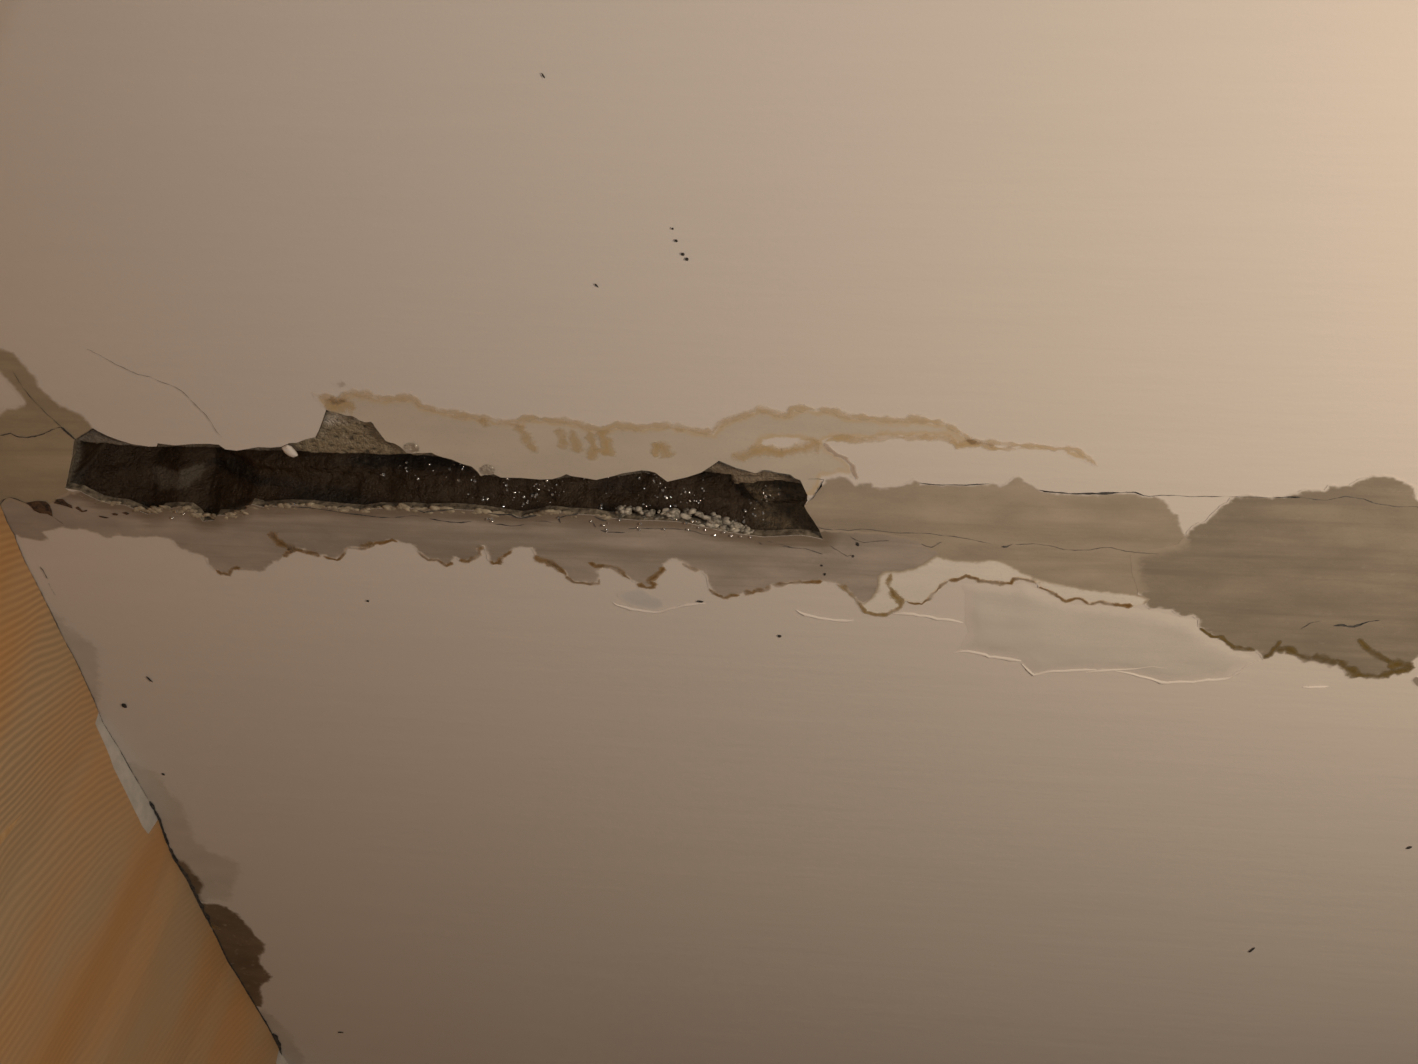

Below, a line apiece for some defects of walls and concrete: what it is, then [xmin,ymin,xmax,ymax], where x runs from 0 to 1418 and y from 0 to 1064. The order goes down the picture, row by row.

spalling [27,410,820,538]
crack [1303,620,1379,628]